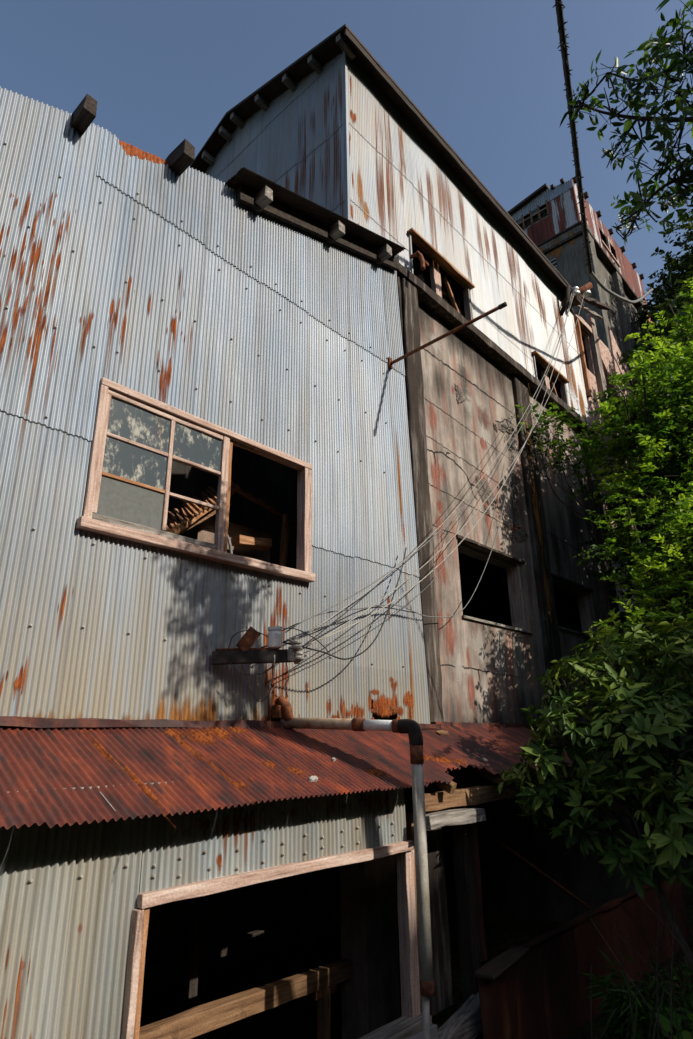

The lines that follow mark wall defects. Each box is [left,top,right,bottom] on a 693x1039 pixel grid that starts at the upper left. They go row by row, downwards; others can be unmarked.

corrosion [285,77,406,237]
corrosion [0,193,70,429]
corrosion [80,311,94,352]
corrosion [106,277,135,374]
corrosion [157,270,192,403]
water stain [431,320,503,382]
corrosion [262,586,289,648]
corrosion [0,661,27,710]
water stain [456,631,505,723]
corrosion [78,717,183,827]
corrosion [146,663,295,871]
corrosion [1,949,31,1039]